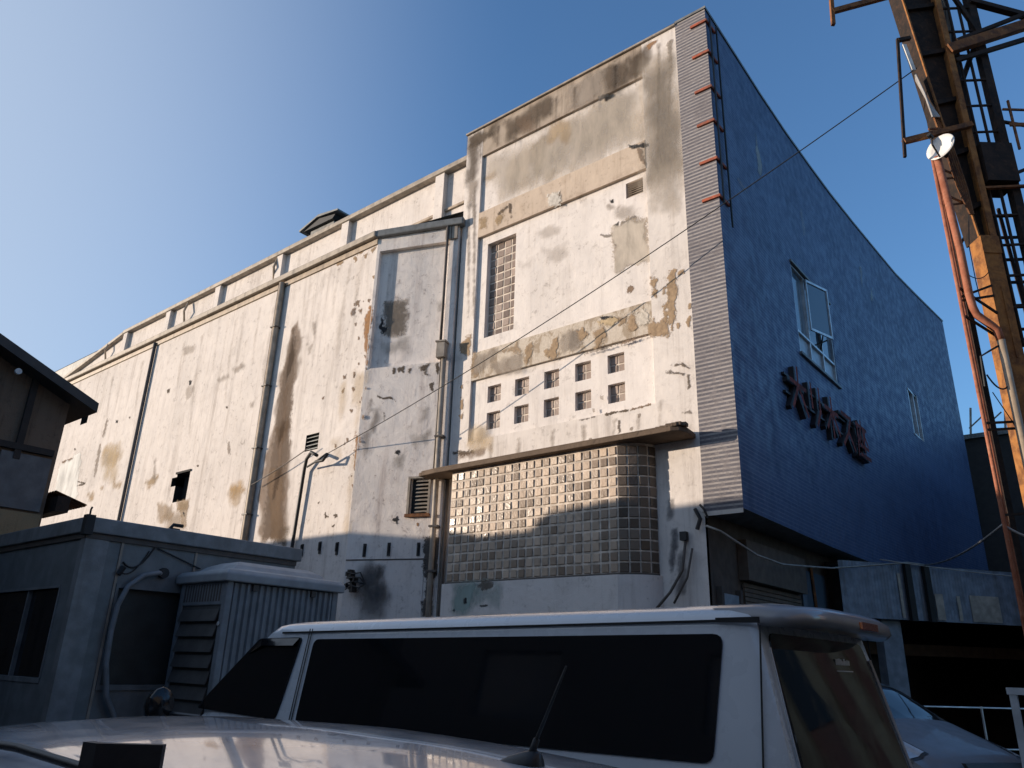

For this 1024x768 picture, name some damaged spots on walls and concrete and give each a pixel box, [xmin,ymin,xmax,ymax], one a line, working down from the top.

water stain [507,98,552,139]
water stain [569,47,683,184]
water stain [467,128,493,206]
peeling [459,269,691,419]
water stain [359,565,384,612]